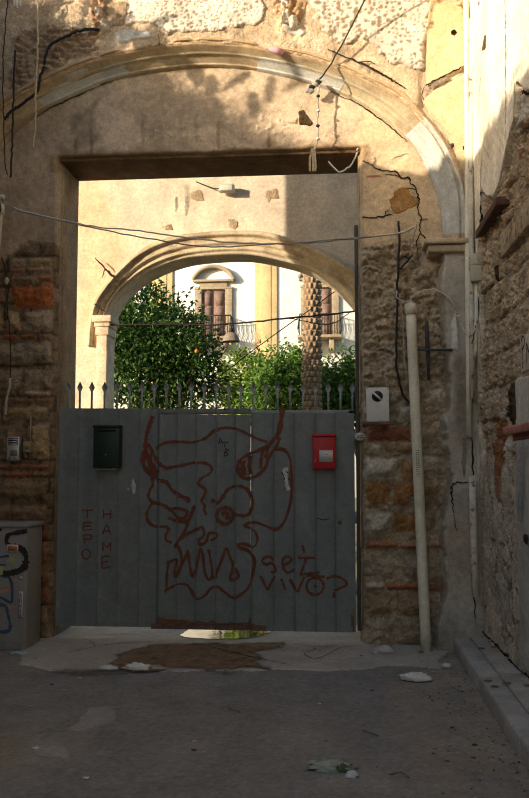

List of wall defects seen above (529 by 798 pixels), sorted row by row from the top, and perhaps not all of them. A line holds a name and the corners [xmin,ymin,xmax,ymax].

flaking render [94,0,266,43]
peeling [36,62,129,105]
peeling [257,57,346,93]
flaking render [280,0,465,237]
crack [328,49,482,119]
crack [331,91,428,252]
flaking render [492,382,516,476]
crack [450,439,474,531]
crack [473,597,529,678]